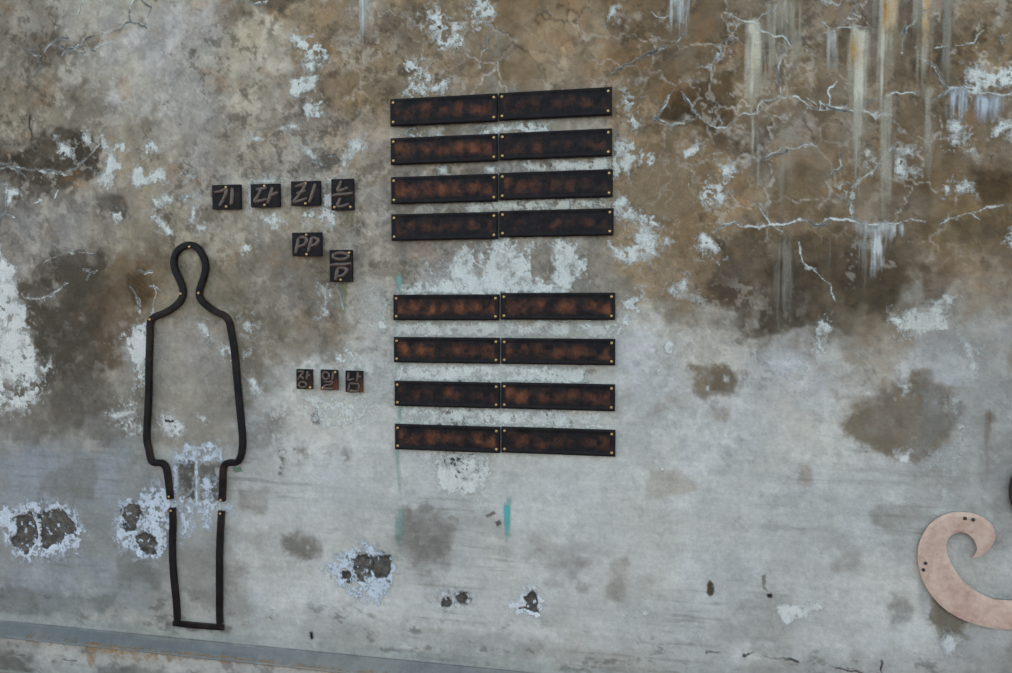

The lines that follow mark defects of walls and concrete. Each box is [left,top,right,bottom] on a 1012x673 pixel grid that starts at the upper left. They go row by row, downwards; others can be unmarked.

leakage [745,0,787,97]
corrosion [827,31,836,53]
crack [654,0,1012,129]
corrosion [848,0,898,175]
corrosion [921,0,932,63]
crack [0,142,101,218]
leakage [700,161,736,211]
crack [716,143,999,300]
leakage [864,222,903,267]
peeling [0,244,52,414]
spalling [0,498,89,566]
spalling [115,414,233,561]